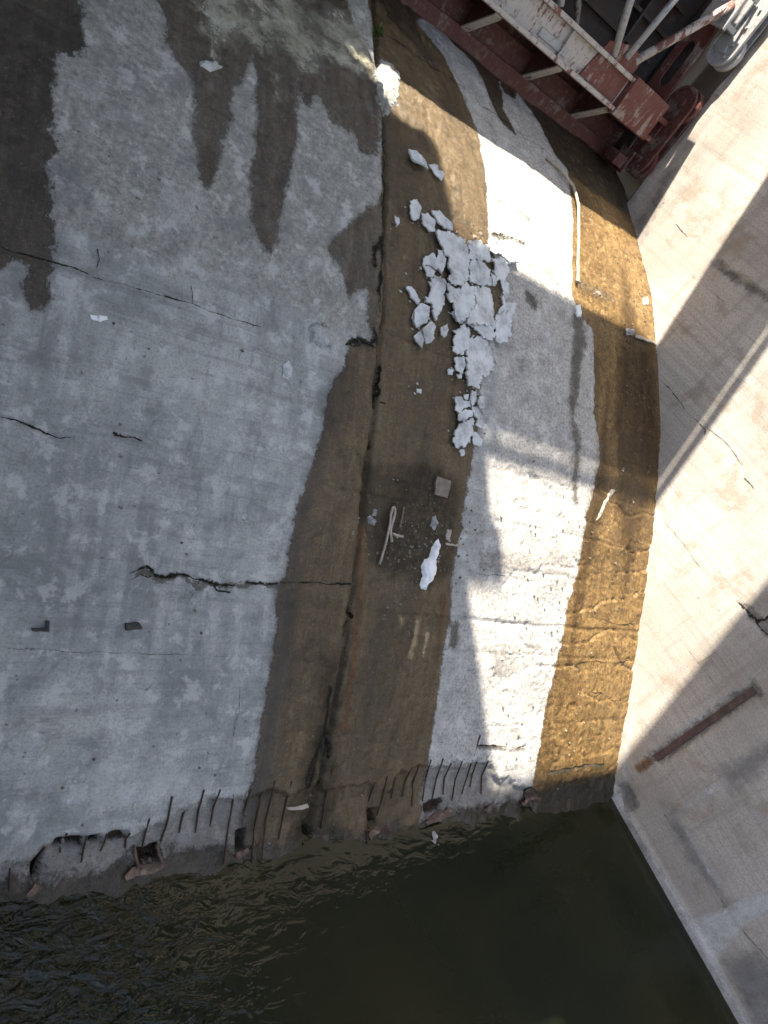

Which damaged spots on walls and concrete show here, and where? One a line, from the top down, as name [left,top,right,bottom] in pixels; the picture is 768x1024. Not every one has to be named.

peeling [408,149,445,181]
leakage [448,36,647,228]
crack [1,417,75,439]
crack [0,246,261,327]
leakage [0,0,503,905]
crack [345,125,386,410]
peeling [390,199,520,456]
leakage [569,314,587,501]
crack [129,565,354,658]
spalling [0,781,276,892]
spalling [366,735,525,846]
leakage [440,773,768,1024]